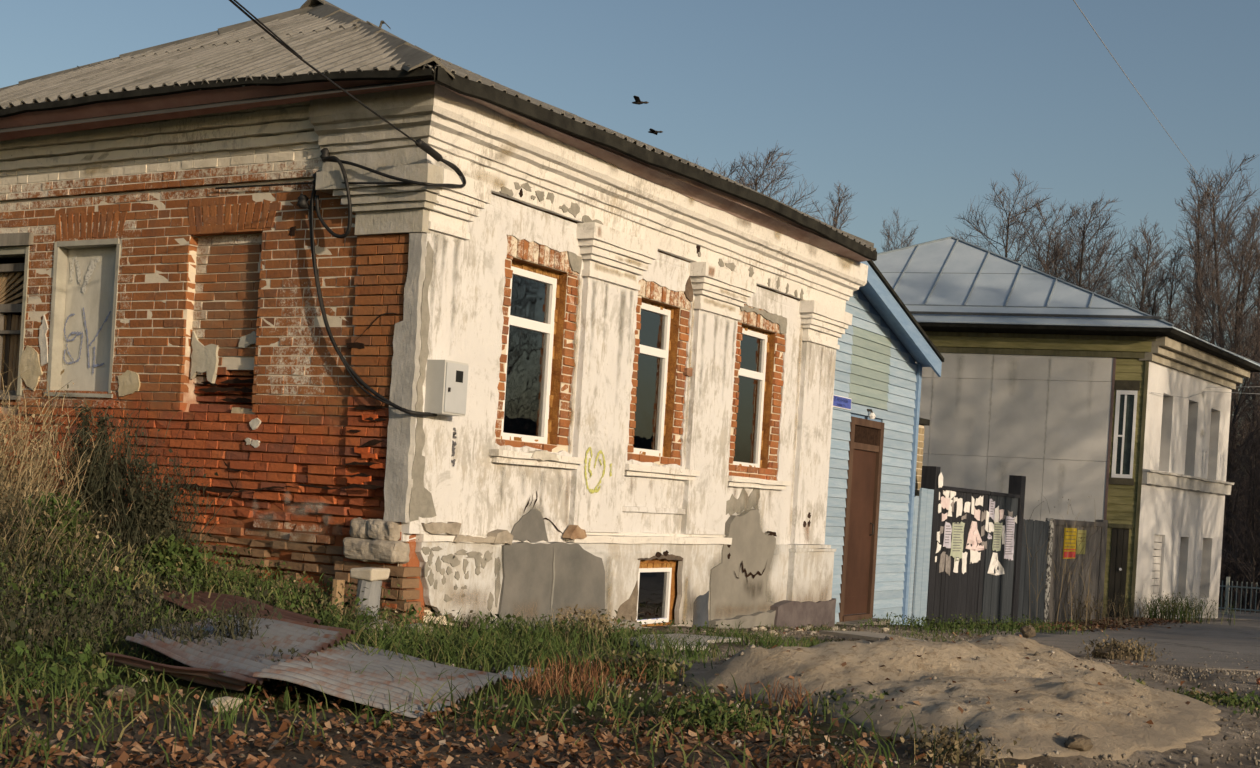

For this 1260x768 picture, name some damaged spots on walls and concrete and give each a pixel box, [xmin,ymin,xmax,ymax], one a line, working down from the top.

peeling [499,182,603,225]
peeling [19,315,49,391]
peeling [117,370,141,396]
peeling [190,331,261,448]
spalling [345,406,387,484]
peeling [409,241,514,611]
peeling [726,488,760,516]